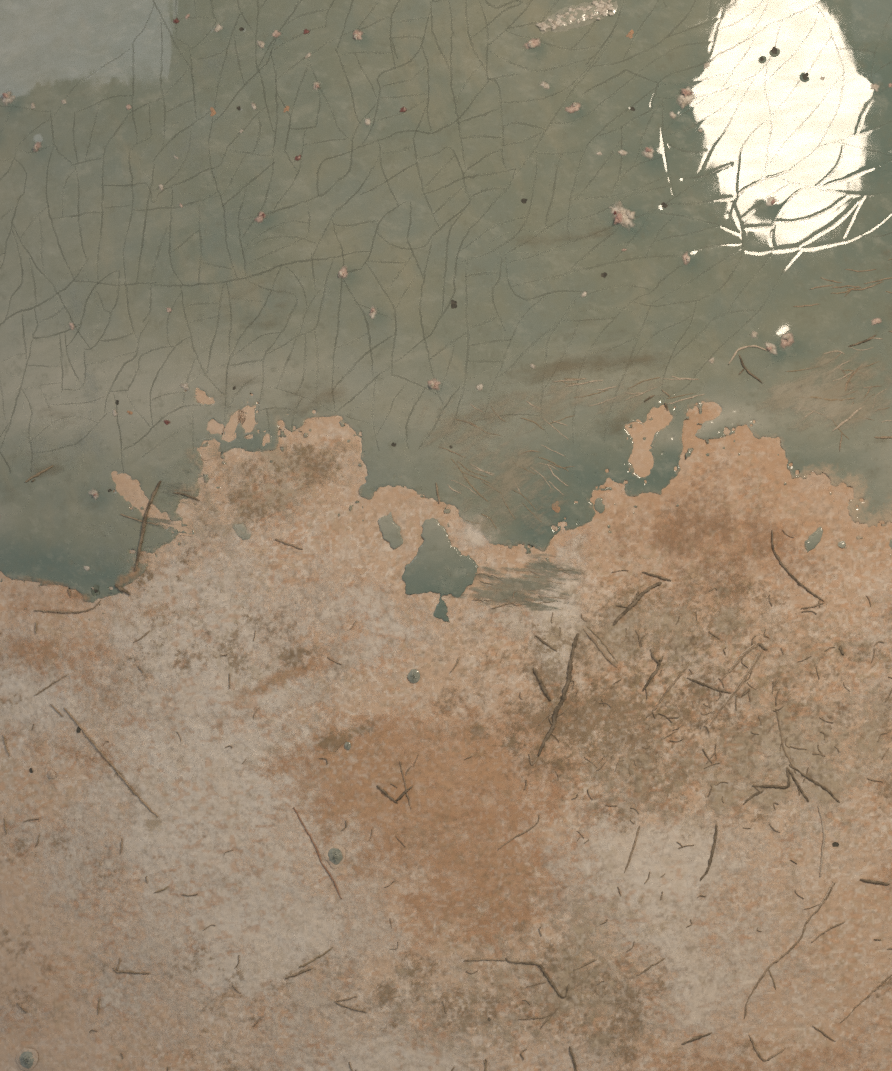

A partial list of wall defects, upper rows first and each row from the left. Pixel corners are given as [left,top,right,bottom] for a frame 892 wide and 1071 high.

peeling [0,383,892,1071]